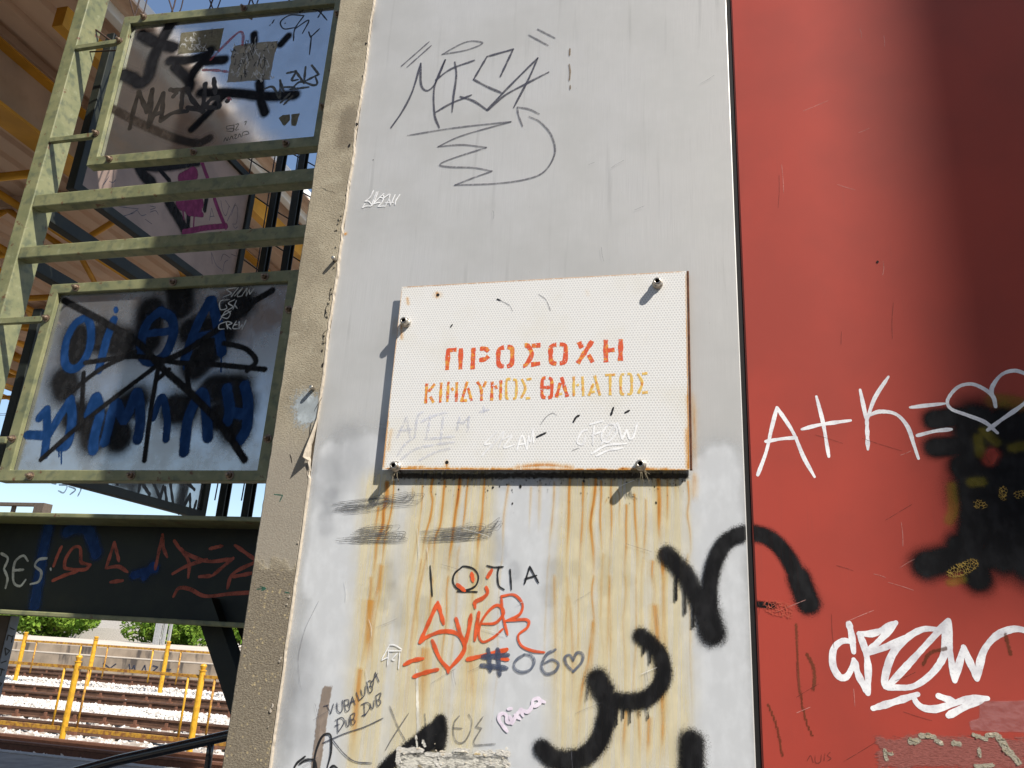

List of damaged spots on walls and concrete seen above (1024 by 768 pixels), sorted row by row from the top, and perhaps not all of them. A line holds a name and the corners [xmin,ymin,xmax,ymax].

corrosion [367,351,690,641]